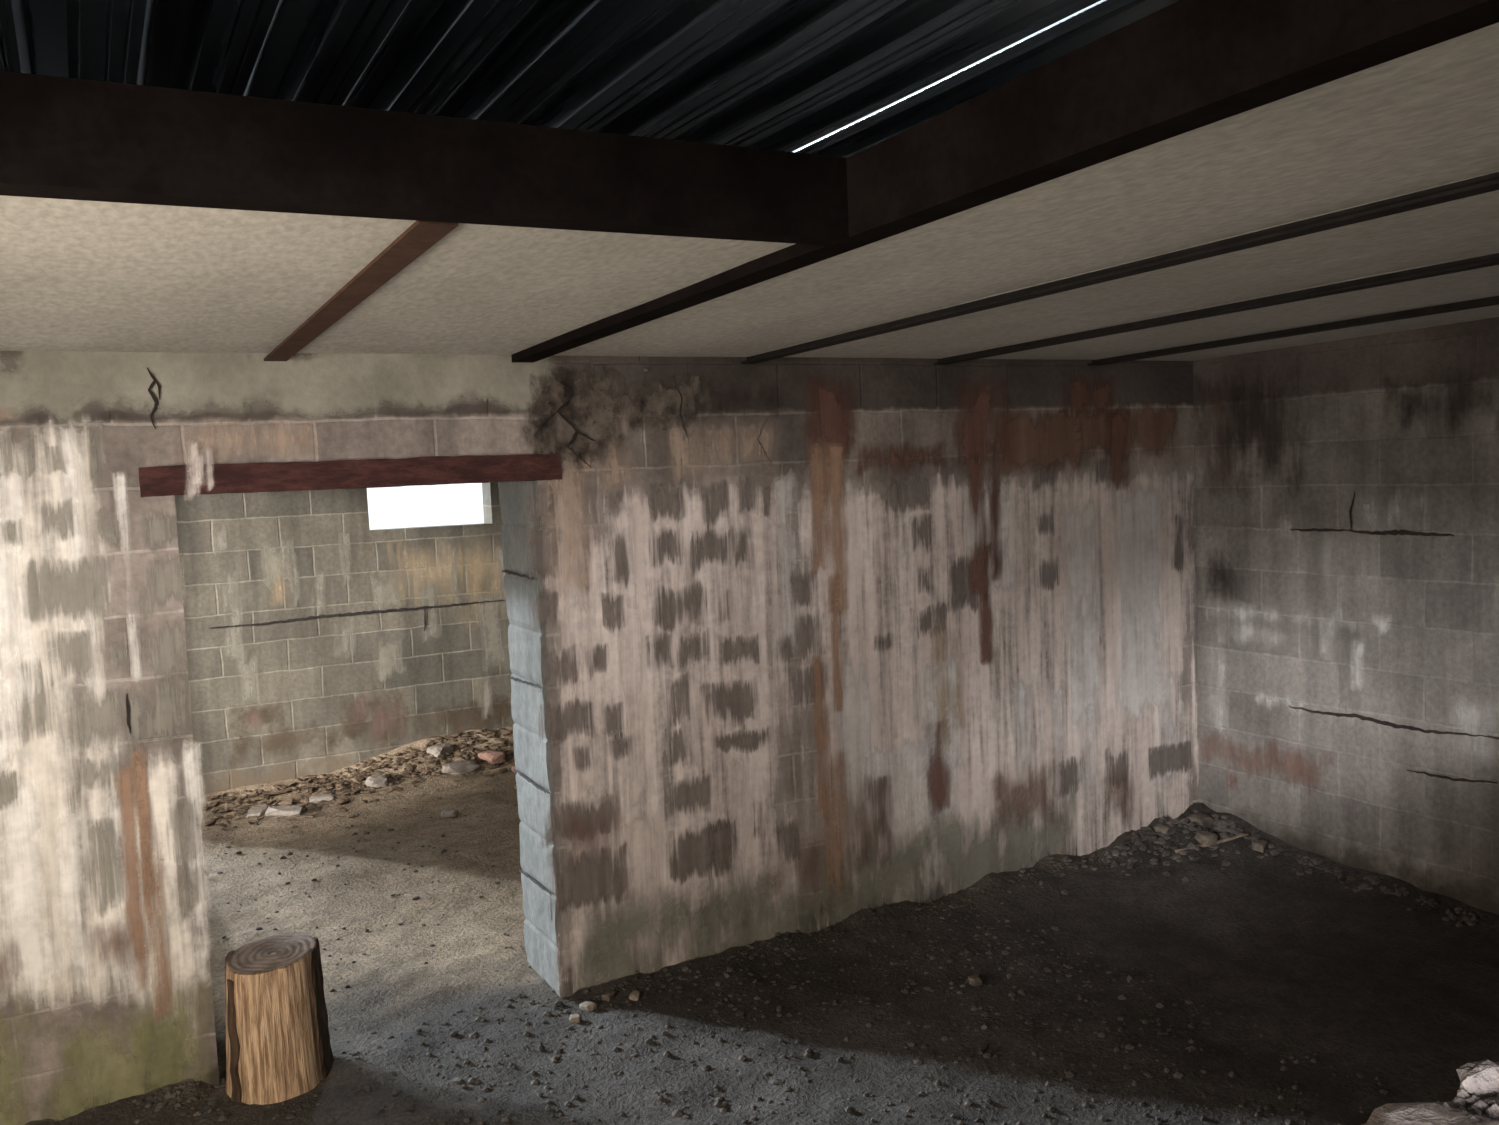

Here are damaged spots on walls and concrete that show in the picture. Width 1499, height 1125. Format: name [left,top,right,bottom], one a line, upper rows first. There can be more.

corrosion [119,754,169,1020]
corrosion [806,378,854,894]
corrosion [928,723,949,812]
corrosion [954,380,1009,664]
crack [1289,706,1499,740]
crack [1407,770,1498,784]